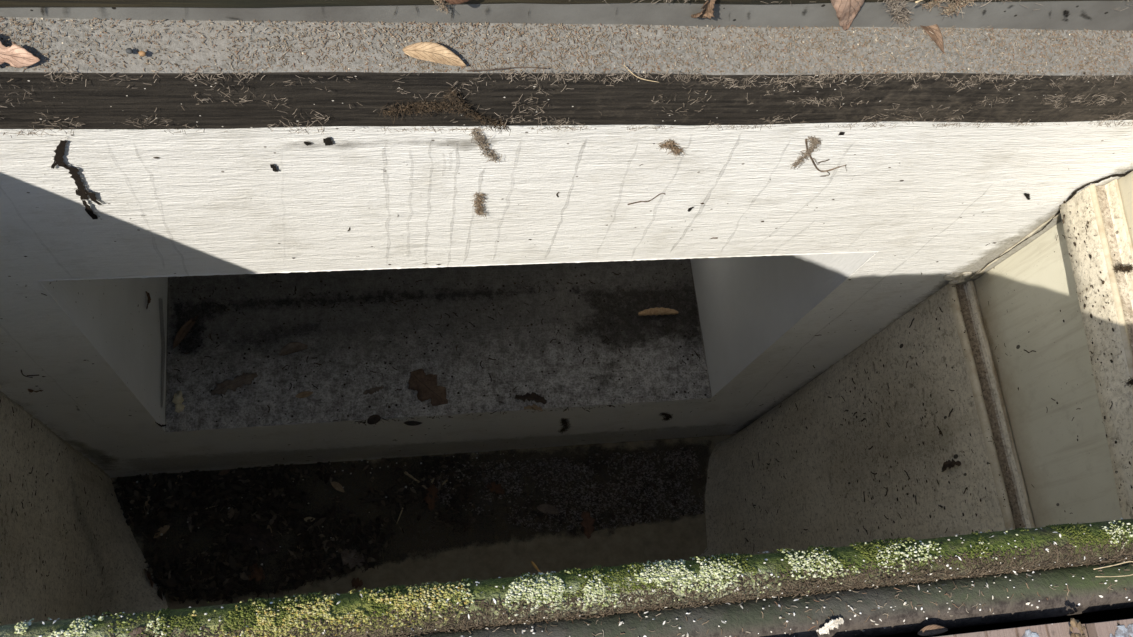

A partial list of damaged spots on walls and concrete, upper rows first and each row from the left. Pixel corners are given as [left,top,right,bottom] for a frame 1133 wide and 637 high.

crack [48,137,105,220]